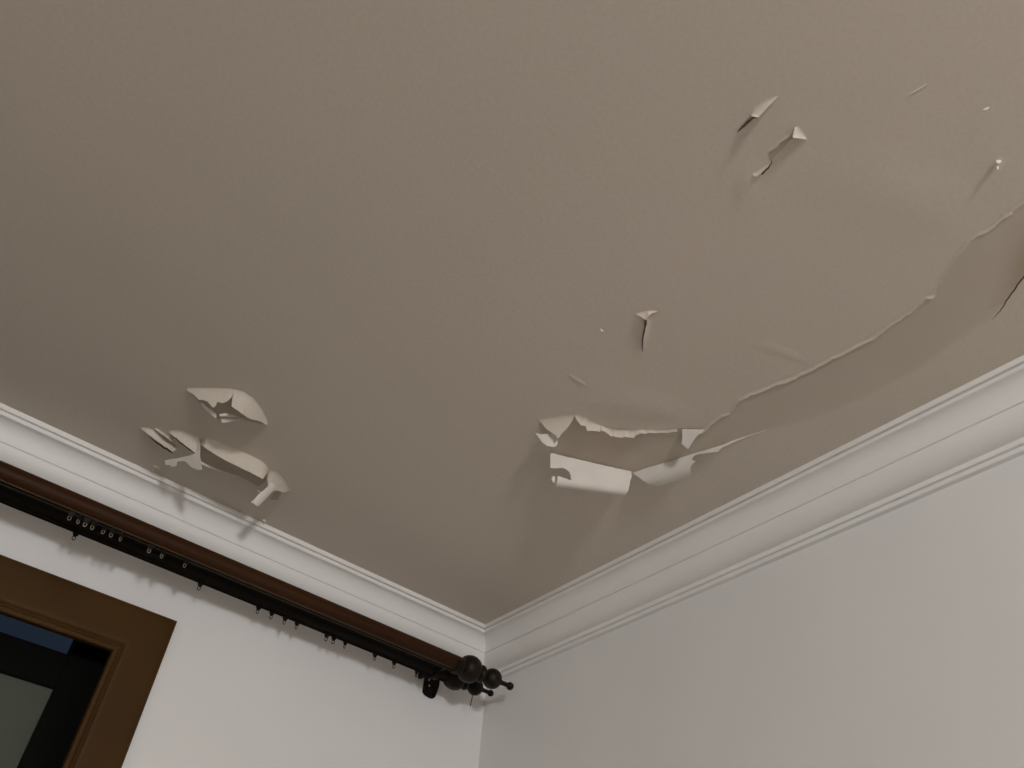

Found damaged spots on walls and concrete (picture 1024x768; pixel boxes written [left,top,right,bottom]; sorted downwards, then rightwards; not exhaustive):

peeling [187,388,267,425]
peeling [141,427,291,513]
peeling [535,406,769,496]